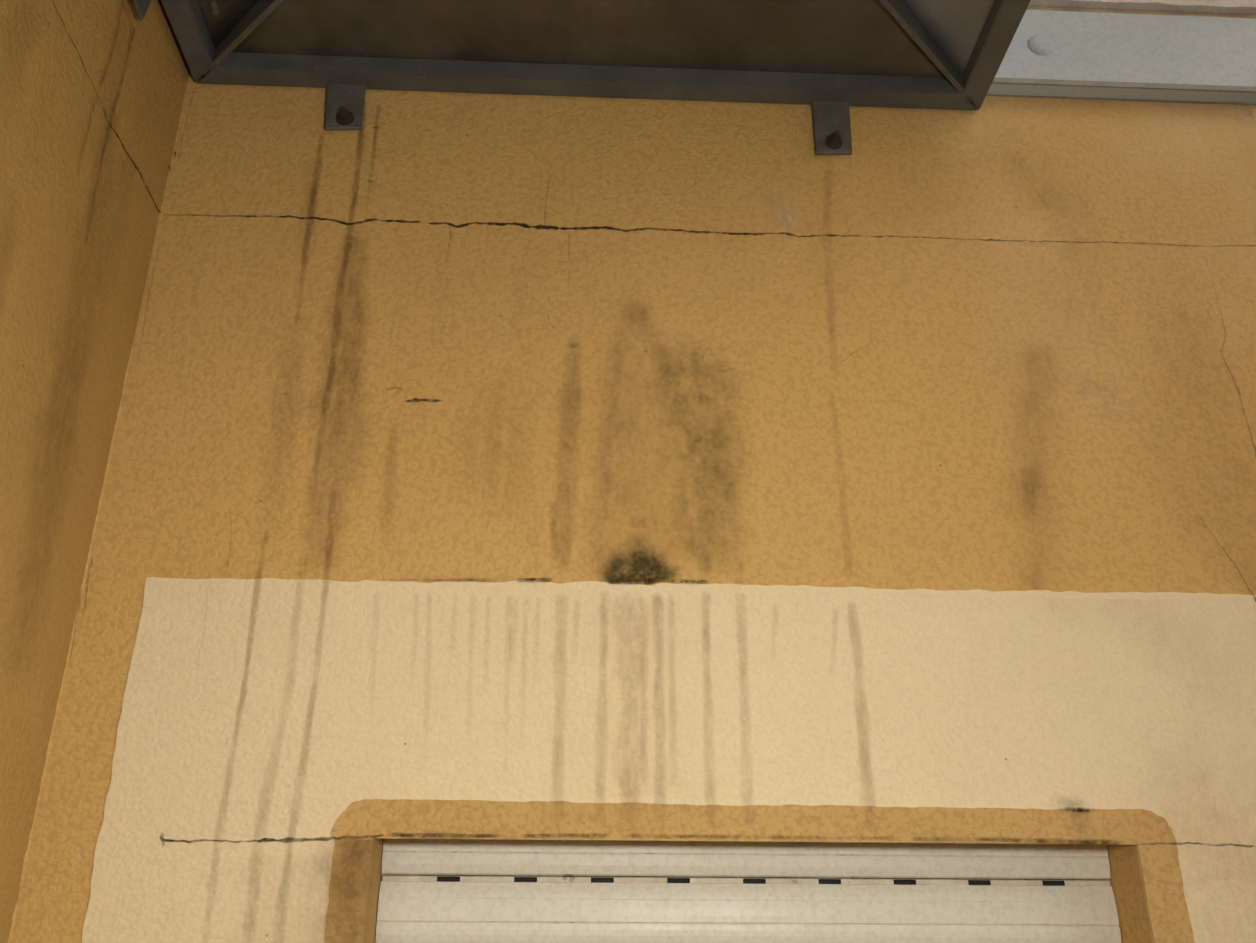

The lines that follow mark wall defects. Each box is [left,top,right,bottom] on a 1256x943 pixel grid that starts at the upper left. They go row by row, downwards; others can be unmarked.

crack [192,214,846,237]
crack [160,835,385,843]